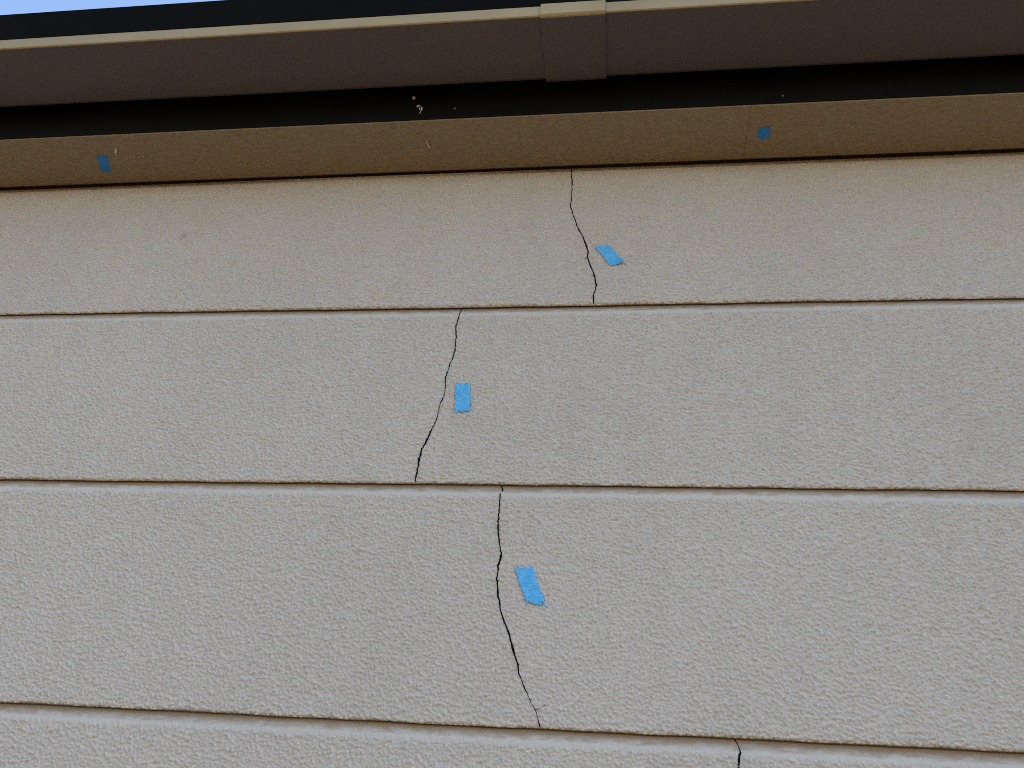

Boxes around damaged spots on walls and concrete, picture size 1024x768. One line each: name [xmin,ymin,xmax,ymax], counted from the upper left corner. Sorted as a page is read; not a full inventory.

crack [570,169,597,303]
crack [415,309,462,482]
crack [496,486,546,727]